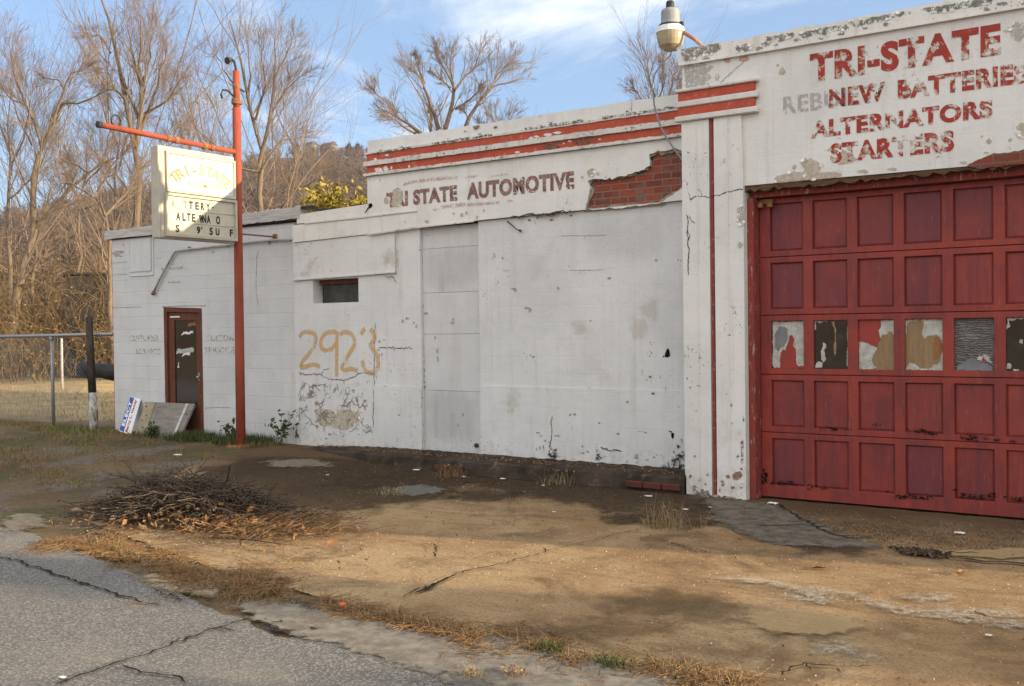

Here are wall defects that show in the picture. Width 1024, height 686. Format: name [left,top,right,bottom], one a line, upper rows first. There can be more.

peeling [681,0,1007,88]
peeling [365,178,451,213]
flaking render [572,152,682,212]
peeling [773,148,868,183]
crack [686,189,743,275]
peeling [772,319,943,370]
peeling [956,354,993,371]
peeling [296,383,372,439]